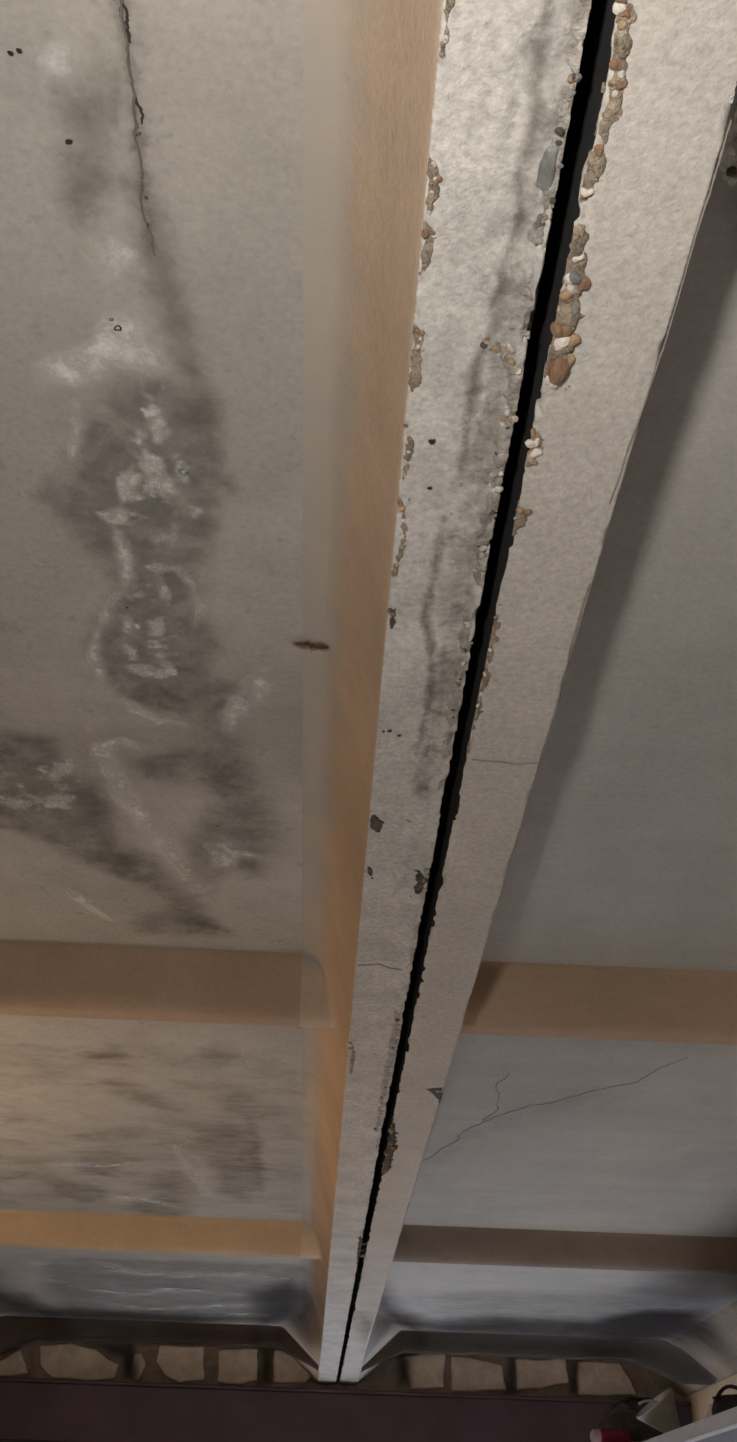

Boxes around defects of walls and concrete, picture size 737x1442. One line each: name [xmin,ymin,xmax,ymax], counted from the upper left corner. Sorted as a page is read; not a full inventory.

crack [119,0,155,257]
spalling [520,0,592,301]
spalling [578,0,637,202]
spalling [543,223,591,391]
crack [609,82,737,504]
damp [47,320,207,715]
spalling [469,328,545,586]
crack [472,583,591,764]
crack [424,1057,689,1160]